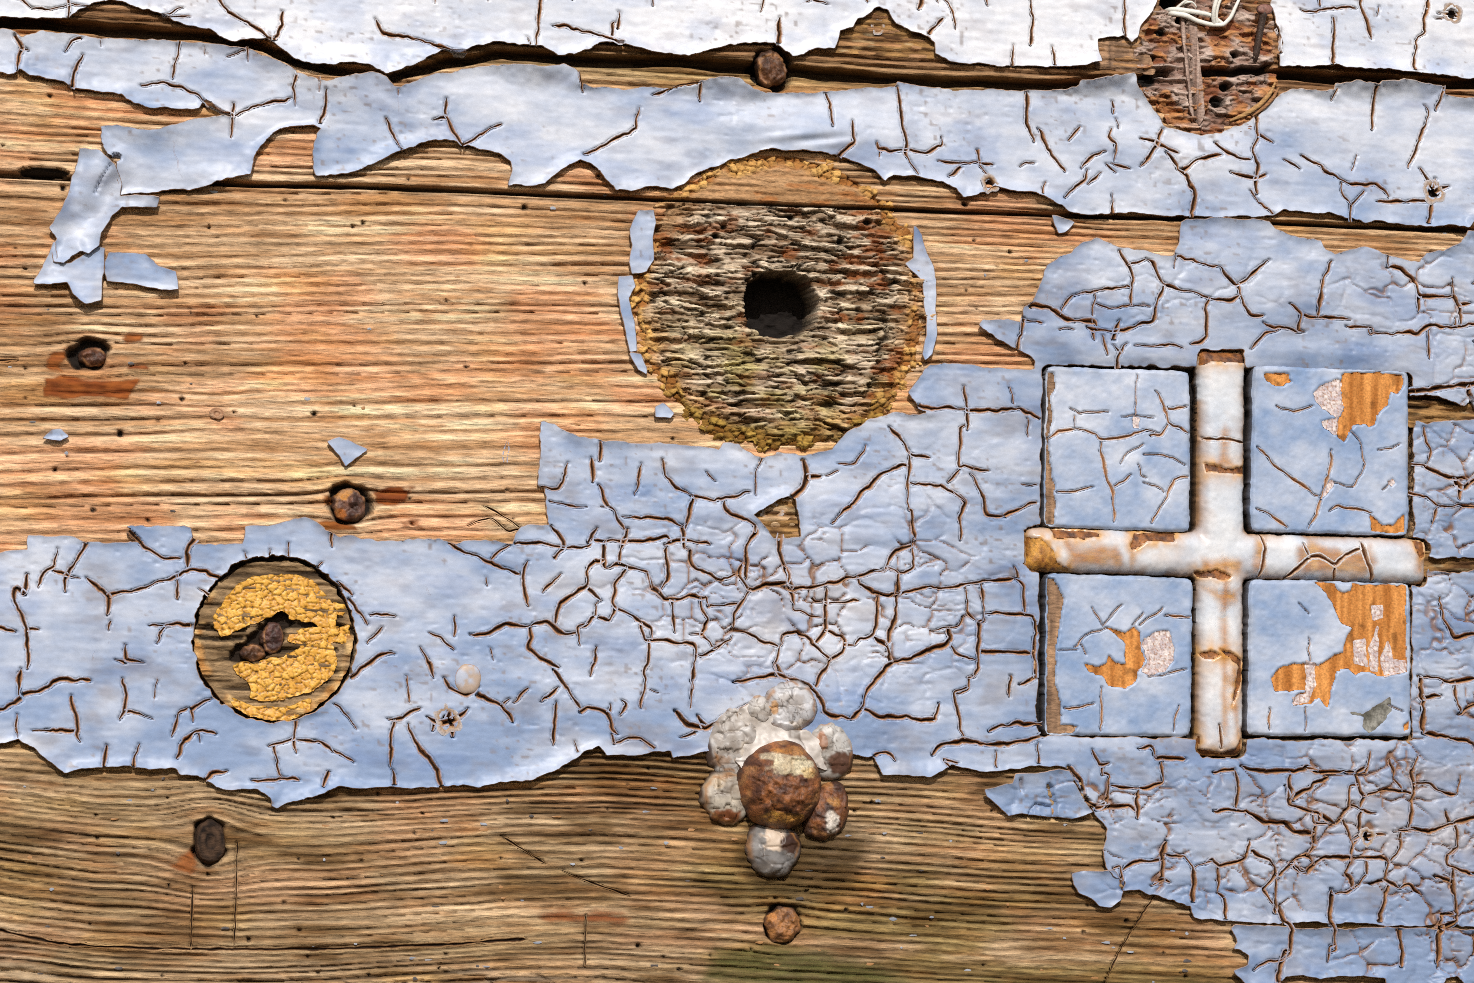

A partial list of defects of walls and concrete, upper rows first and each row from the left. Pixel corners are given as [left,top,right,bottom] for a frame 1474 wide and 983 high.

crack [375,19,467,58]
crack [527,0,655,45]
crack [141,0,329,138]
crack [824,0,1445,223]
peeling [0,0,1474,304]
corrosion [1198,351,1244,366]
corrosion [1205,464,1243,474]
corrosion [1025,530,1175,571]
peeling [0,210,1474,983]
crack [0,250,1474,983]
corrosion [1199,649,1241,701]
corrosion [1196,736,1241,755]